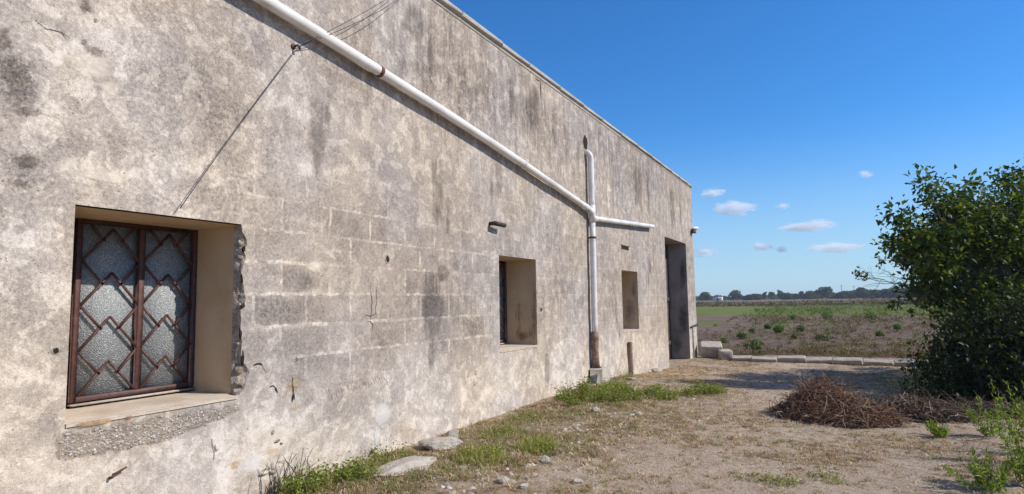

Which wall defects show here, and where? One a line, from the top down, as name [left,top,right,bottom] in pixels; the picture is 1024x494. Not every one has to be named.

flaking render [56,225,250,460]